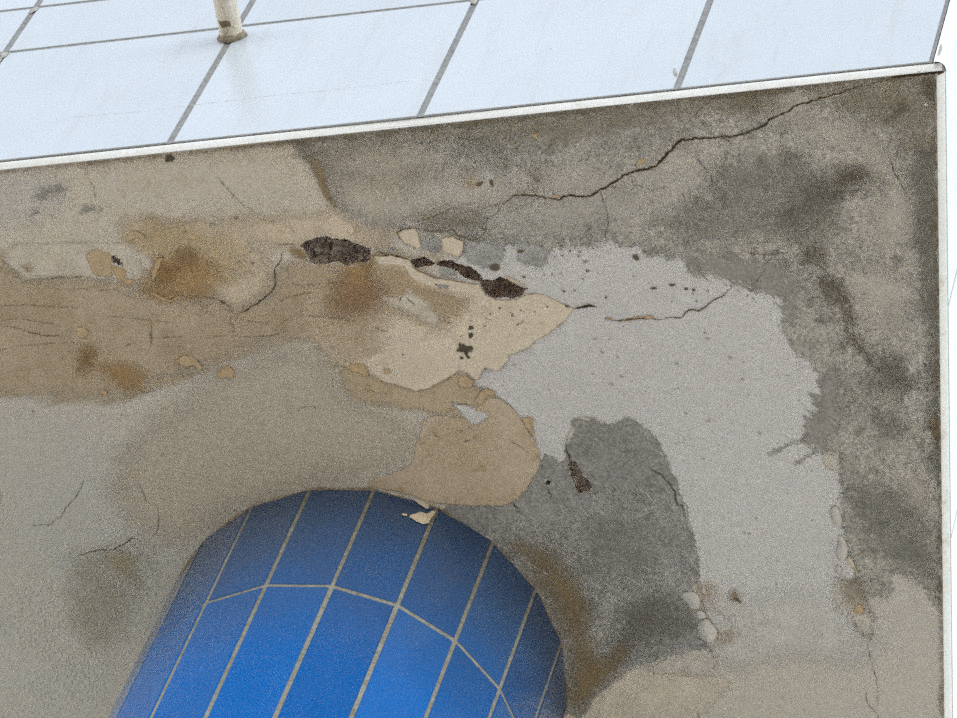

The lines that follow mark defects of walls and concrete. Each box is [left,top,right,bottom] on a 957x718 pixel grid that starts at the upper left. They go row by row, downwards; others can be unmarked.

crack [422,71,944,241]
peeling [86,249,133,286]
damp [0,168,471,409]
peeling [276,74,943,642]
damp [289,75,942,596]
crack [565,252,784,322]
crack [808,262,878,370]
peeling [442,416,713,718]
damp [505,507,708,718]